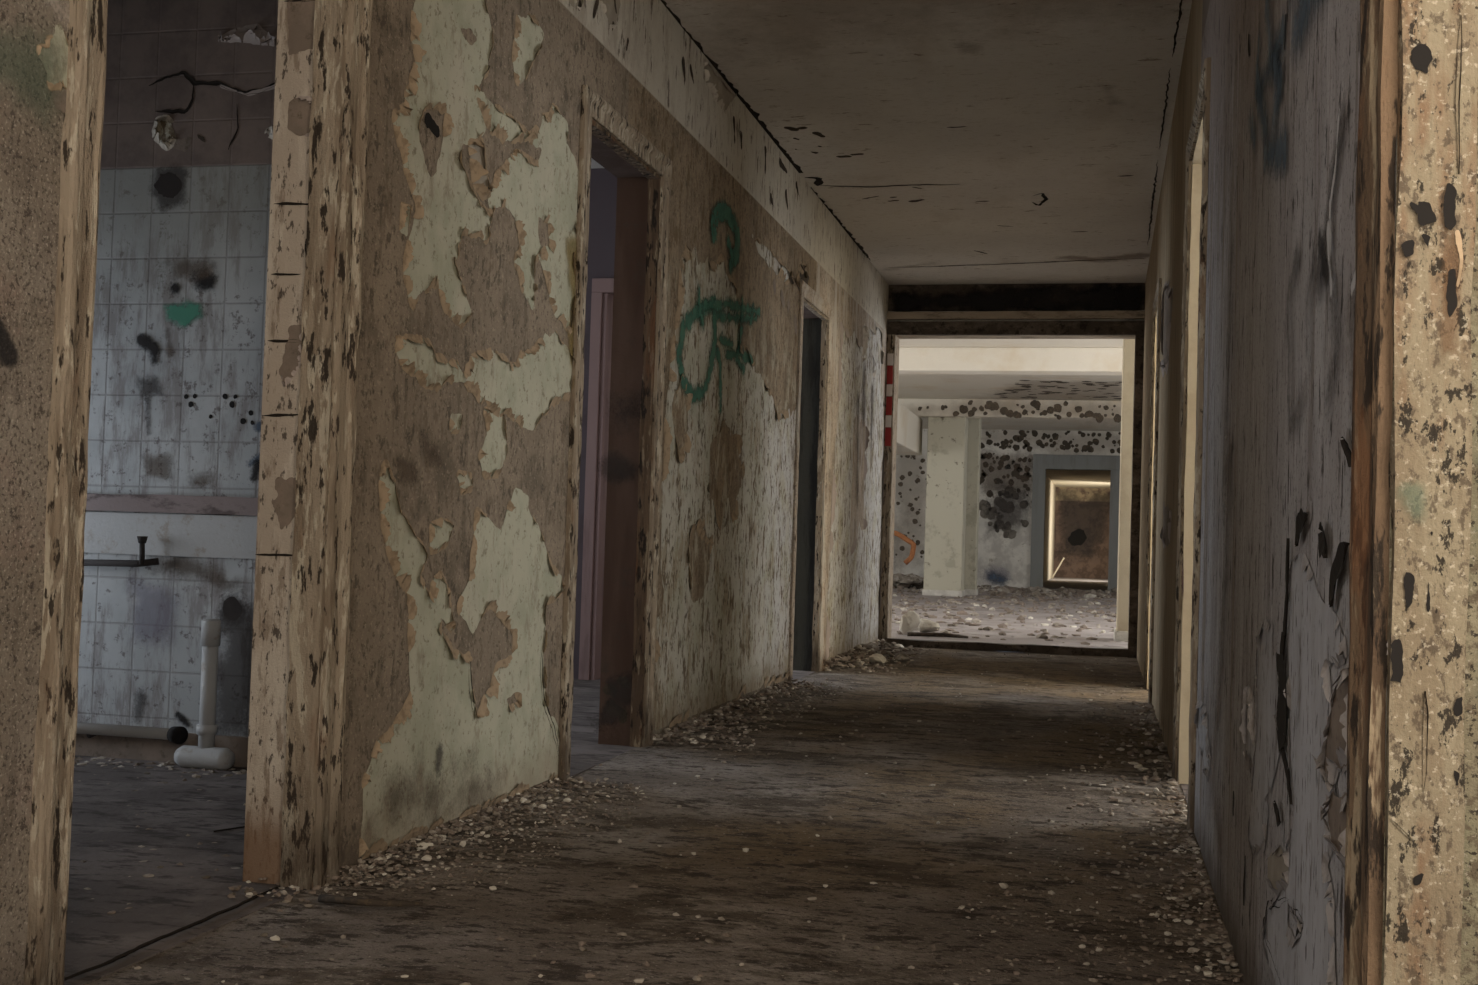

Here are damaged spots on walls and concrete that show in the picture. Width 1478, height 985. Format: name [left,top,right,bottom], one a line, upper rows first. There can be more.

crack [149,71,275,150]
peeling [359,0,579,860]
leakage [918,380,1122,539]
peeling [1233,553,1349,985]